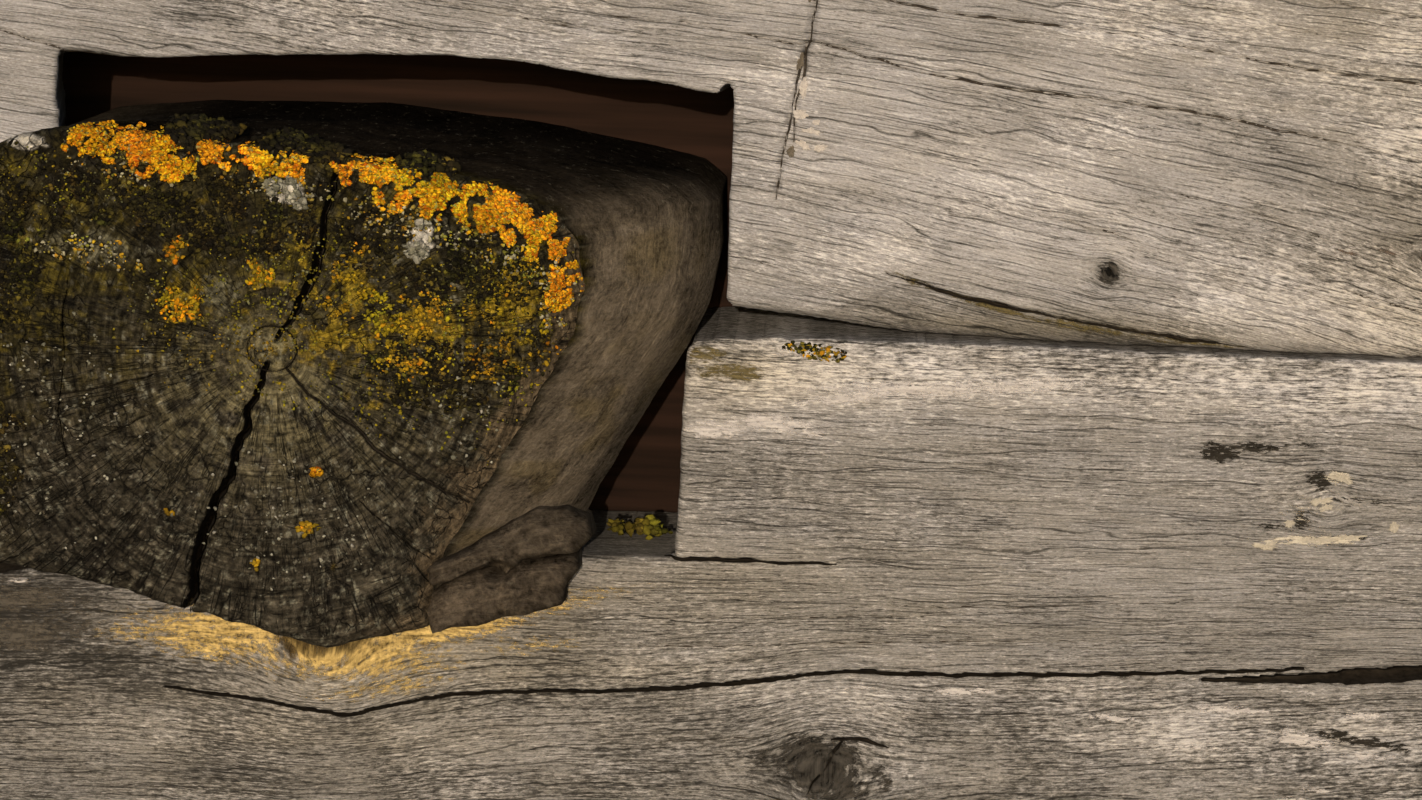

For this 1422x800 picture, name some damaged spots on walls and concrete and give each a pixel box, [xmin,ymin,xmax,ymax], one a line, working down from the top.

crack [432,0,1422,151]
crack [886,273,1241,347]
crack [183,172,470,613]
crack [664,555,837,565]
crack [164,589,1422,717]